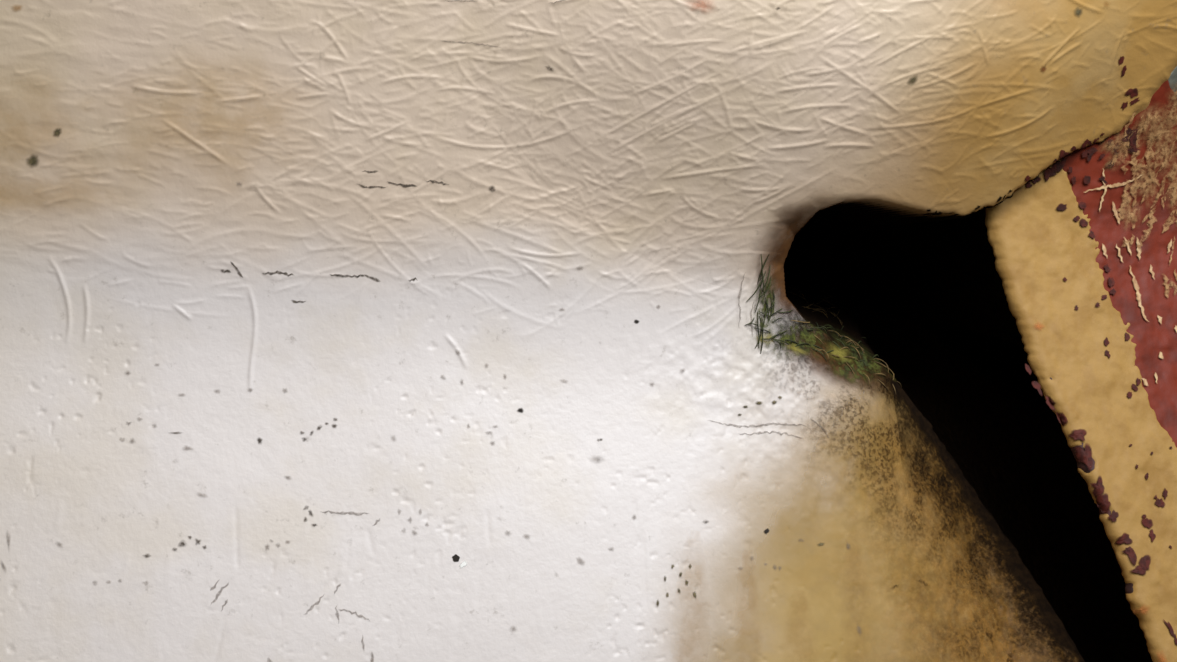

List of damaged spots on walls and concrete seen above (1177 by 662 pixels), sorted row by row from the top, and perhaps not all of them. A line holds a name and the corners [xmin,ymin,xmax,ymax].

peeling [1121,88,1139,110]
peeling [1025,128,1140,188]
peeling [908,190,1011,219]
peeling [1057,202,1095,239]
peeling [1096,264,1116,307]
peeling [1025,364,1119,522]
peeling [1154,488,1168,507]
damp [713,376,1076,662]
peeling [1142,514,1156,542]
peeling [1114,533,1151,575]